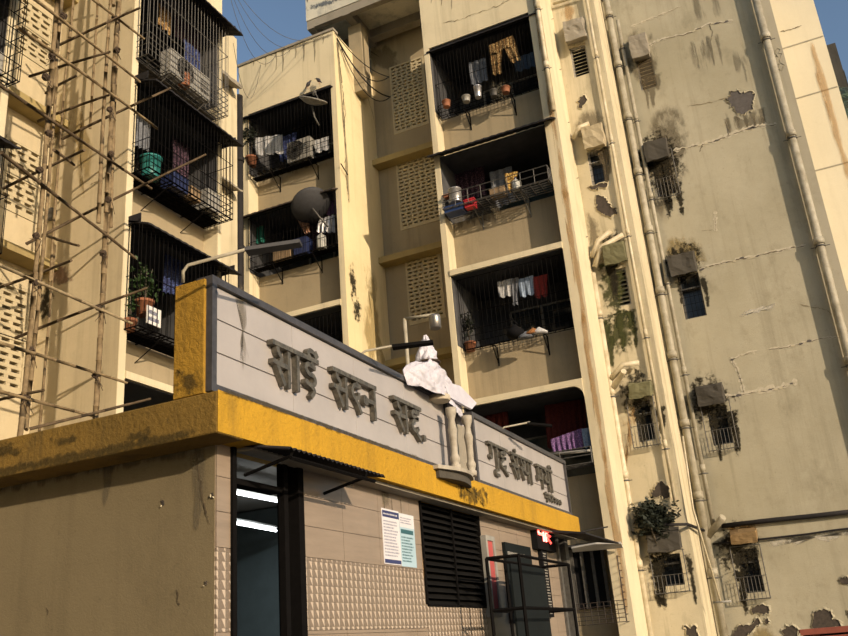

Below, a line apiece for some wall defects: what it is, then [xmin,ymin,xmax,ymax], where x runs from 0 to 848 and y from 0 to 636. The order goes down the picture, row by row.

crack [649,19,733,47]
spalling [724,89,756,117]
crack [673,122,777,152]
spalling [587,181,619,220]
water stain [661,181,684,217]
crack [699,244,806,270]
water stain [606,264,619,301]
water stain [603,309,638,366]
crack [725,336,839,401]
spalling [682,623,700,636]
spalling [730,603,772,636]
spalling [780,606,848,636]